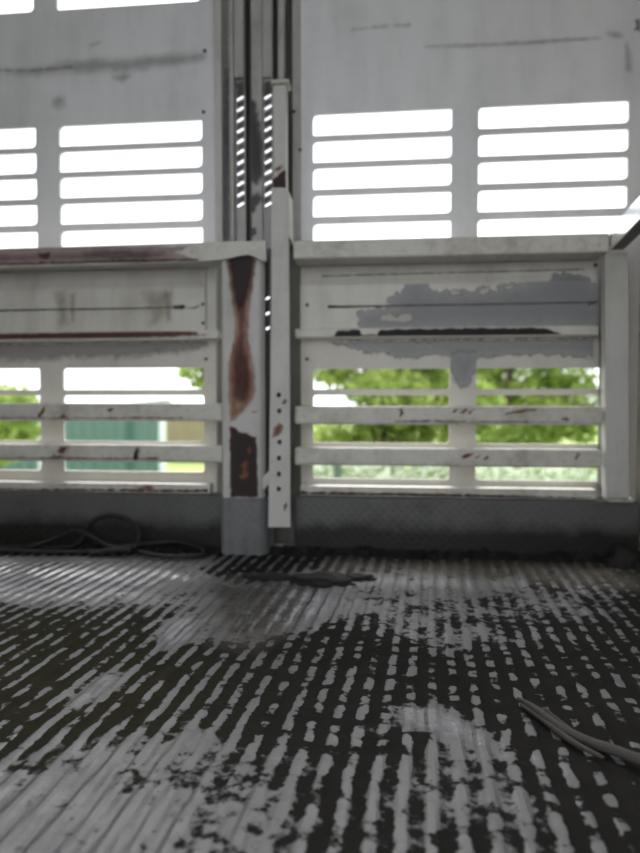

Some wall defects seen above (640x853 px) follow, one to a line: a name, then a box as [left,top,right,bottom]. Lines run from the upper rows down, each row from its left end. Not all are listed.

corrosion [0,247,198,265]
peeling [356,272,597,328]
corrosion [0,331,206,339]
corrosion [227,256,258,498]
peeling [331,337,594,387]